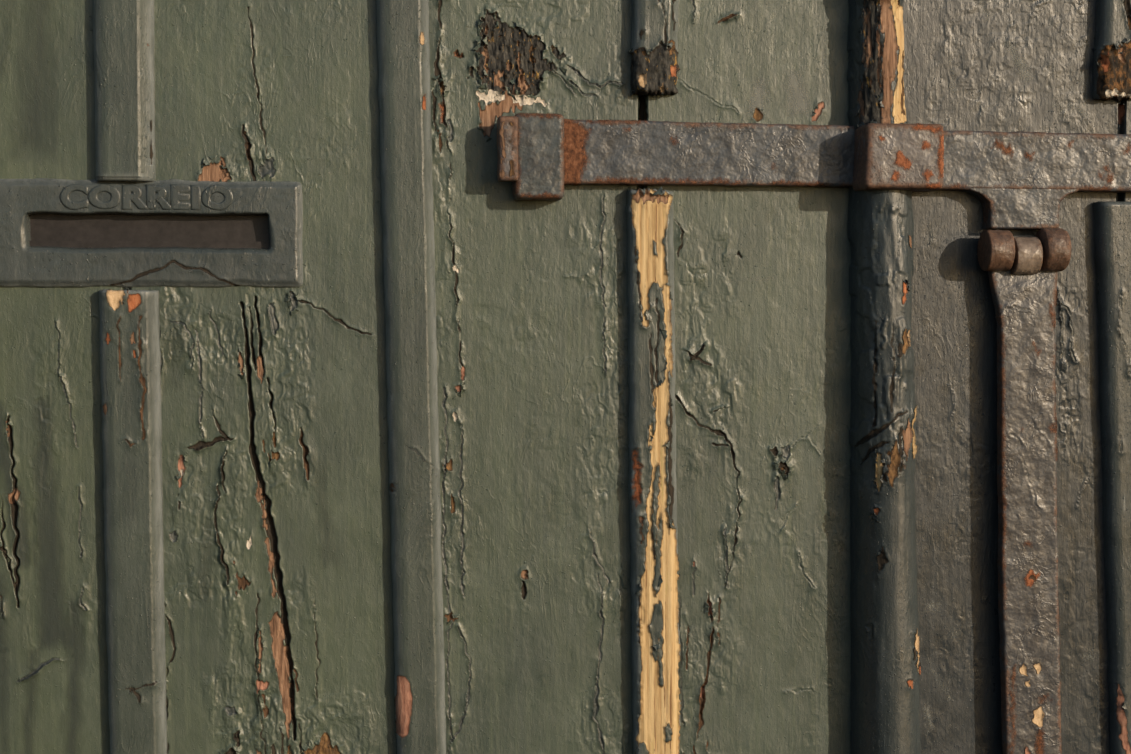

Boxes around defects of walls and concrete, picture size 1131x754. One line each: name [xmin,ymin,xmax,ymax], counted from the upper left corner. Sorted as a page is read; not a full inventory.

crack [242,7,267,181]
peeling [467,10,568,107]
rust [499,113,611,200]
peeling [854,0,906,129]
rust [891,150,912,181]
rust [914,123,944,189]
rust [995,141,1032,160]
peeling [1093,0,1131,129]
crack [0,415,20,612]
crack [110,260,321,754]
crack [635,246,742,754]
peeling [246,480,341,754]